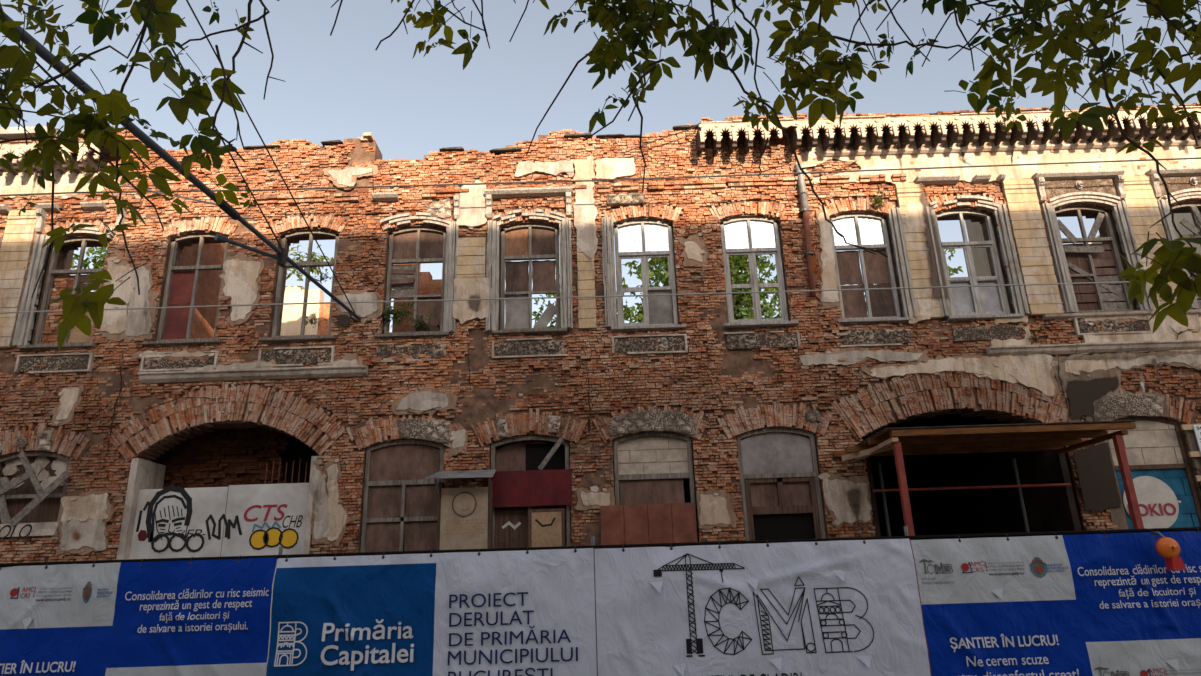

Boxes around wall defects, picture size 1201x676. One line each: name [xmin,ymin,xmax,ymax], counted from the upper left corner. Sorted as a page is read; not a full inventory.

flaking render [0,170,122,200]
flaking render [322,164,378,190]
flaking render [457,180,487,229]
flaking render [515,155,635,260]
flaking render [793,208,1201,423]
spalling [318,354,430,370]
flaking render [51,385,84,426]
flaking render [391,387,468,456]
flaking render [56,490,114,556]
flaking render [310,458,356,546]